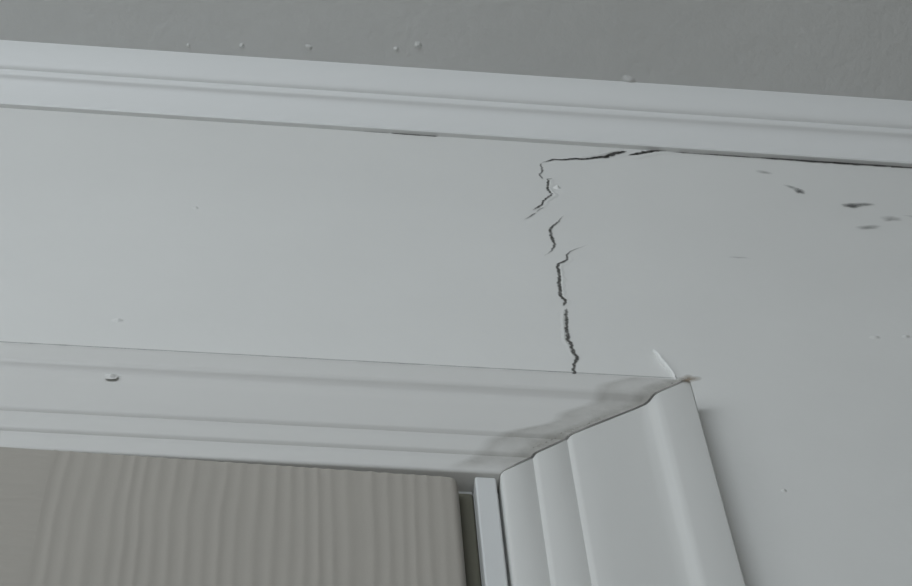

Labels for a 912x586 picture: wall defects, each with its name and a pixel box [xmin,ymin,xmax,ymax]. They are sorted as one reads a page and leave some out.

crack [529,148,912,374]